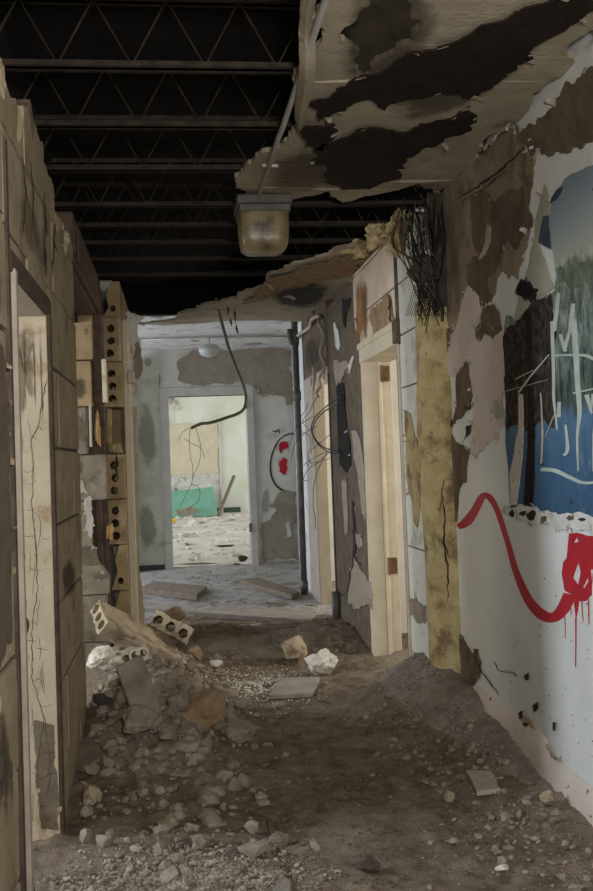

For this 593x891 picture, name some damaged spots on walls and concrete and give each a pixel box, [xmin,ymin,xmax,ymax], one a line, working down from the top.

crack [22,157,57,277]
flaking render [443,66,593,522]
peeling [168,397,183,425]
flaking render [176,348,293,405]
peeling [171,473,220,491]
spalling [276,355,373,610]
flaking render [259,490,299,562]
crack [22,381,56,820]
flaking render [459,635,482,687]